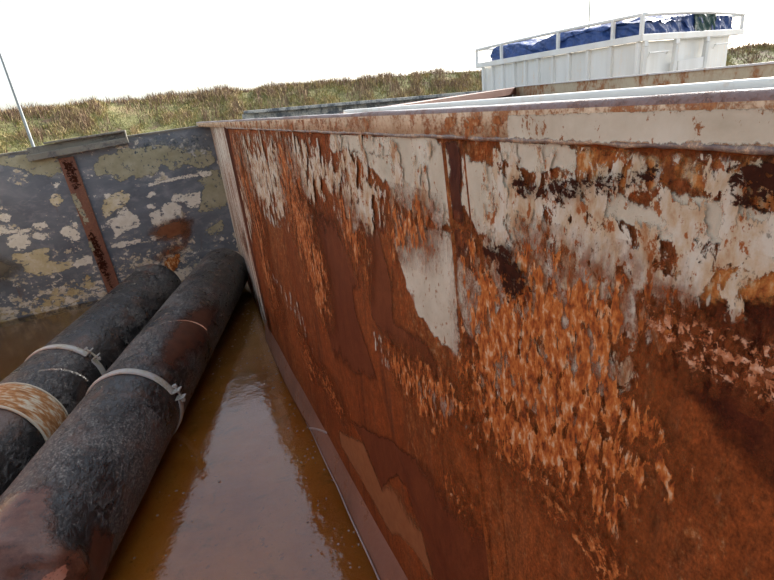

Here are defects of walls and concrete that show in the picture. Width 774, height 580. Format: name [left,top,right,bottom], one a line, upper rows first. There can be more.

peeling [0,153,63,207]
peeling [93,135,227,239]
spalling [0,212,103,324]
peeling [119,237,196,277]
rust [151,218,192,272]
peeling [232,108,774,396]
rust [230,116,774,580]